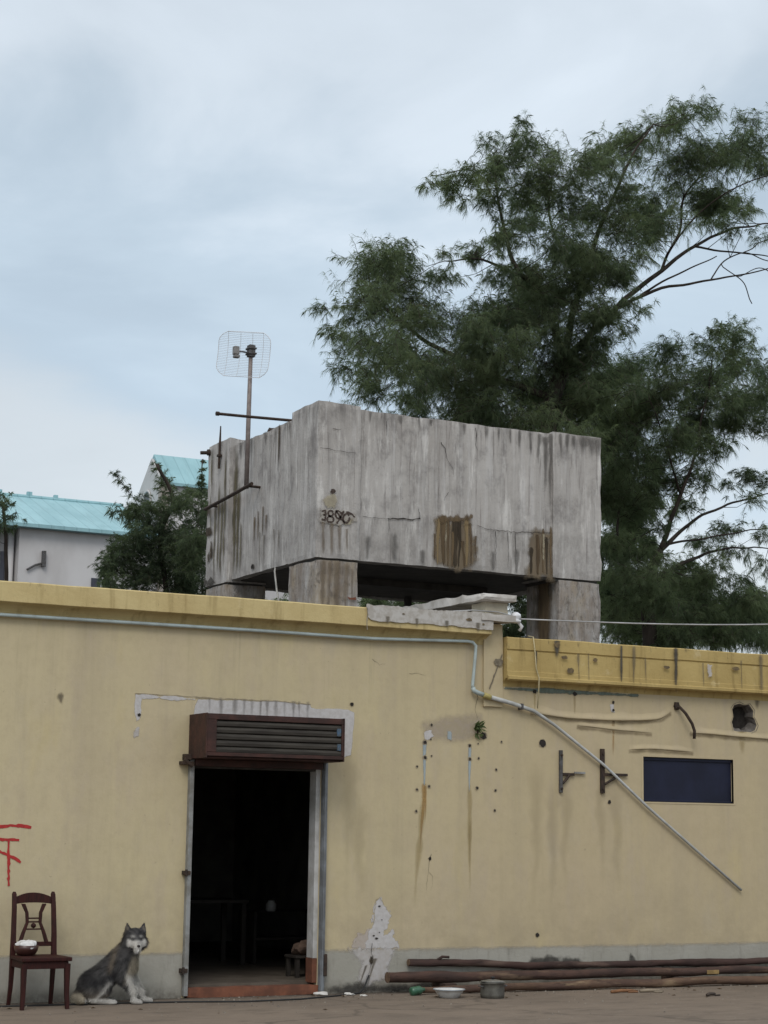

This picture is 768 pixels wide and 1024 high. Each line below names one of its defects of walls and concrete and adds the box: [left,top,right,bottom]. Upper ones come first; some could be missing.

damp [485,426,600,486]
damp [209,432,275,575]
corrosion [433,514,478,571]
corrosion [527,527,553,639]
flaking render [134,693,354,757]
spalling [731,700,758,733]
peeling [351,897,399,987]